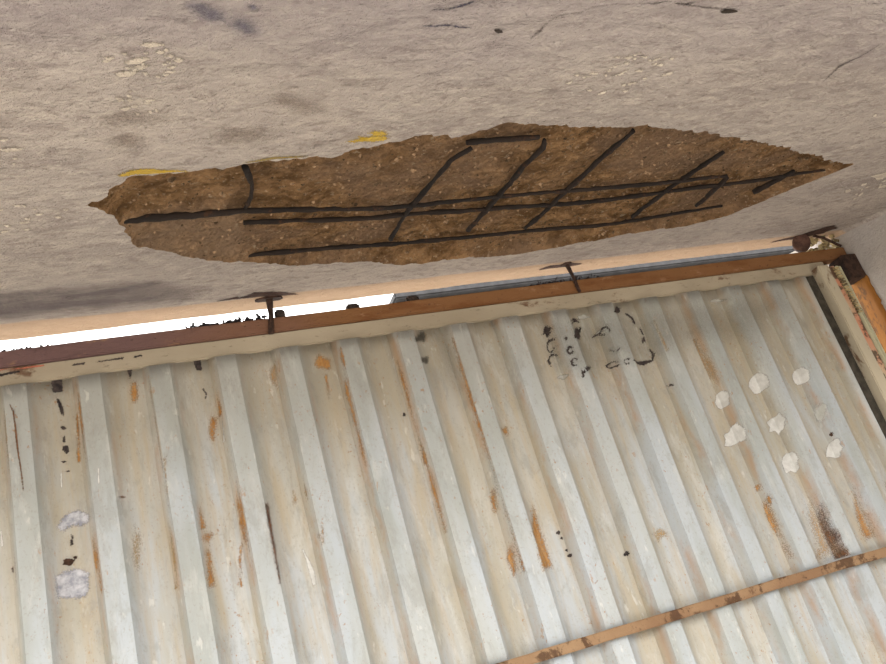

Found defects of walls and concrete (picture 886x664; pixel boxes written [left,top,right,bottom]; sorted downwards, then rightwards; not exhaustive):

spalling [86,122,854,266]
rust [76,393,84,462]
rust [209,402,222,440]
rust [344,380,365,462]
rust [453,338,491,463]
rust [507,533,524,576]
rust [531,508,552,572]
rust [811,509,849,560]